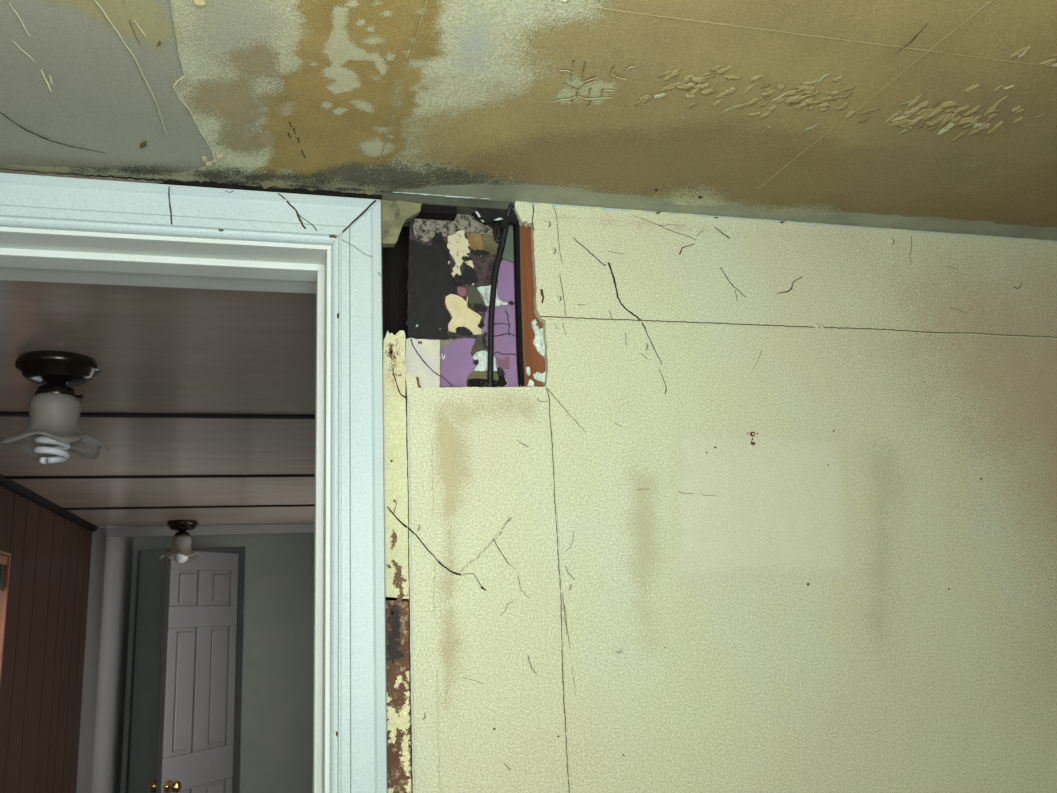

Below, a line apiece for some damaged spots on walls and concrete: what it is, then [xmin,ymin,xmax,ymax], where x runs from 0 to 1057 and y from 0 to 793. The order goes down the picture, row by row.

water stain [51,0,1057,228]
crack [1,168,383,257]
spalling [382,214,514,387]
crack [494,302,517,356]
spalling [526,367,545,387]
spalling [531,319,545,358]
crack [532,202,1057,394]
crack [387,339,486,793]
crack [494,539,529,616]
crack [517,387,584,793]
water stain [766,224,1057,775]
peeling [387,671,412,793]